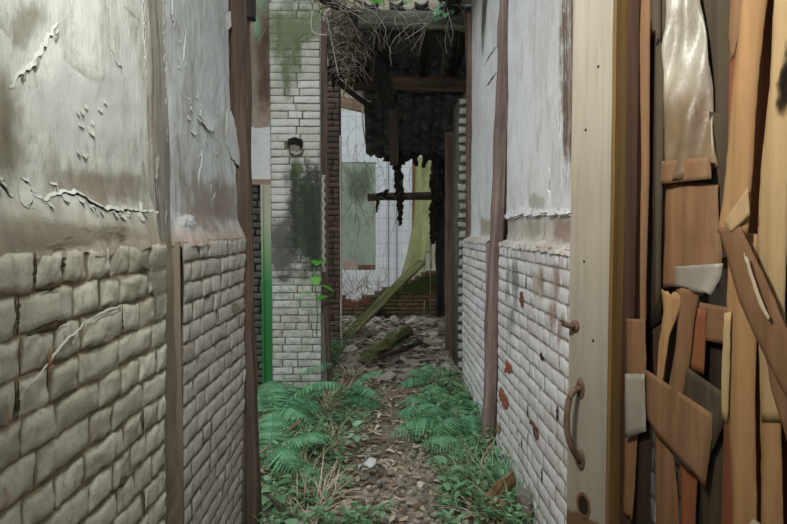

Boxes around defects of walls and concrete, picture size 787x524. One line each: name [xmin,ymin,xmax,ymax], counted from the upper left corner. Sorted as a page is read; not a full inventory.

peeling [9,21,60,89]
leakage [0,81,12,158]
peeling [69,72,124,140]
peeling [188,104,240,166]
spalling [18,176,37,210]
leakage [271,161,321,282]
peeling [504,207,571,220]
crack [25,304,123,390]